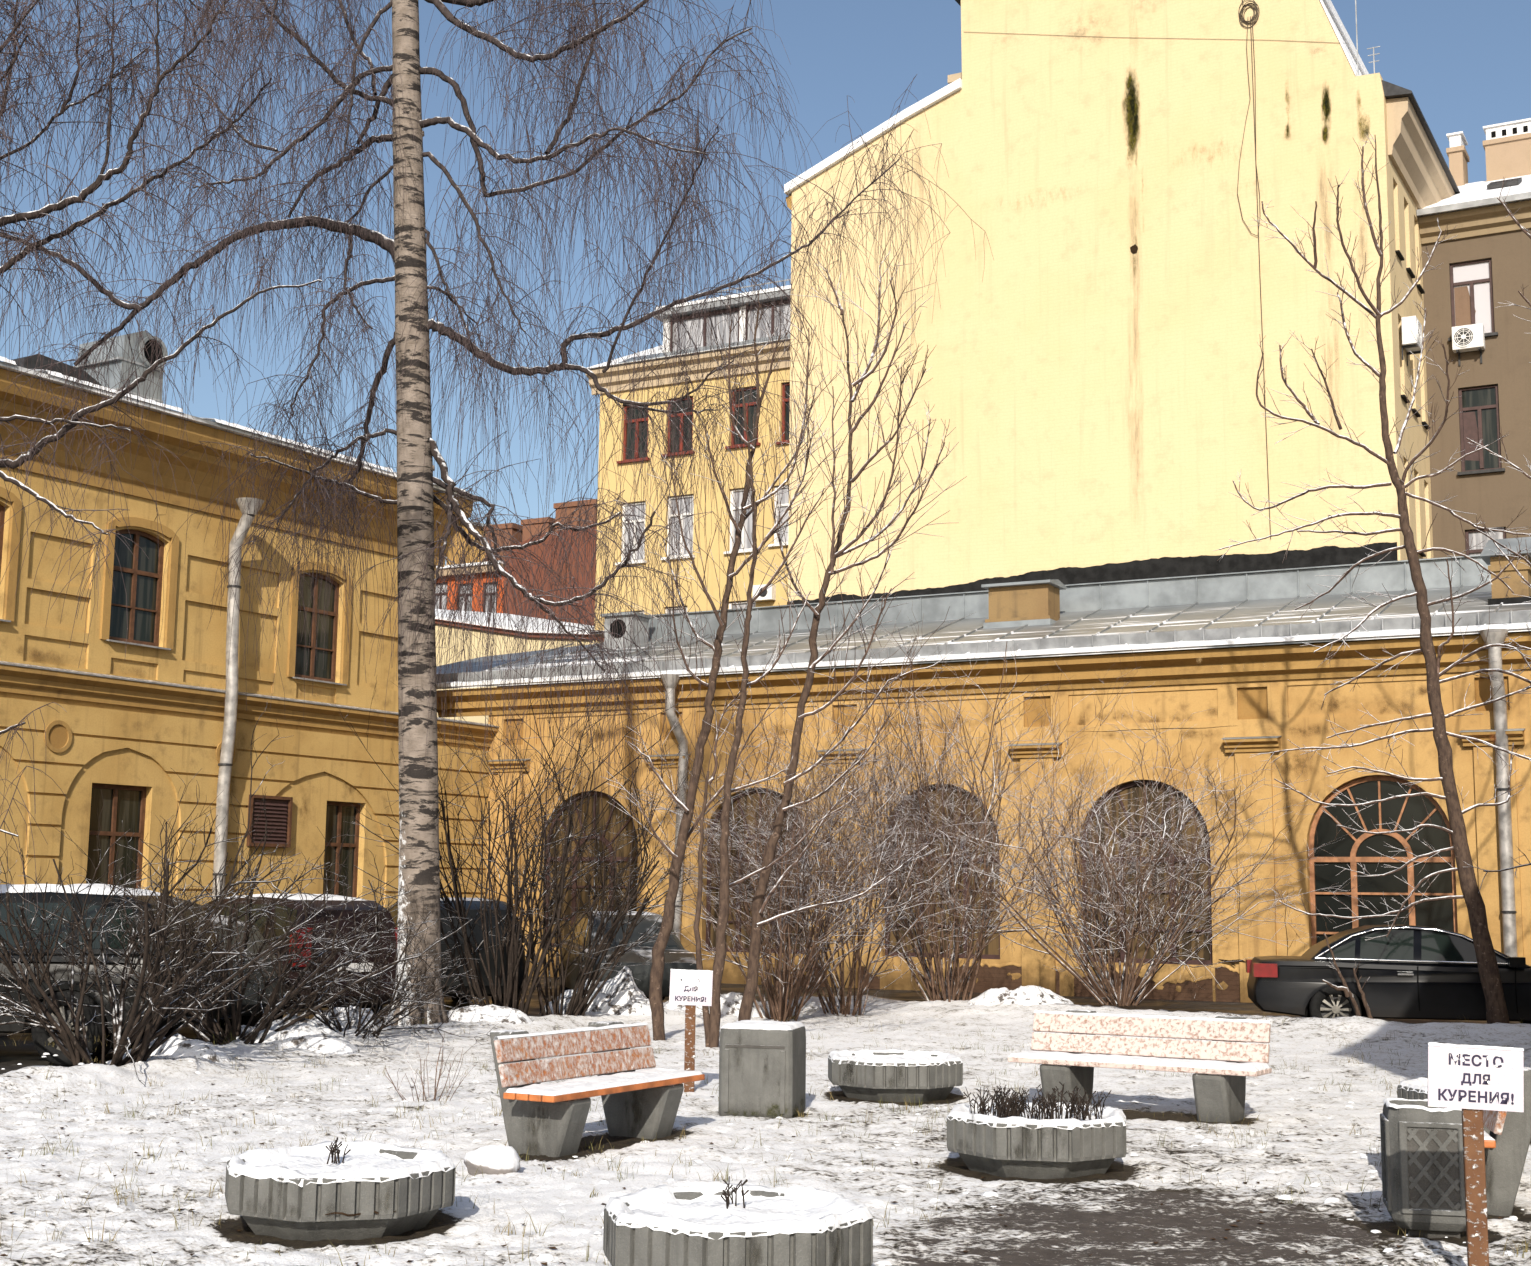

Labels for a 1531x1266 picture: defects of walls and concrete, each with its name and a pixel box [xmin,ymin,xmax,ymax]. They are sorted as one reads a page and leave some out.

damp [1130,86,1138,133]